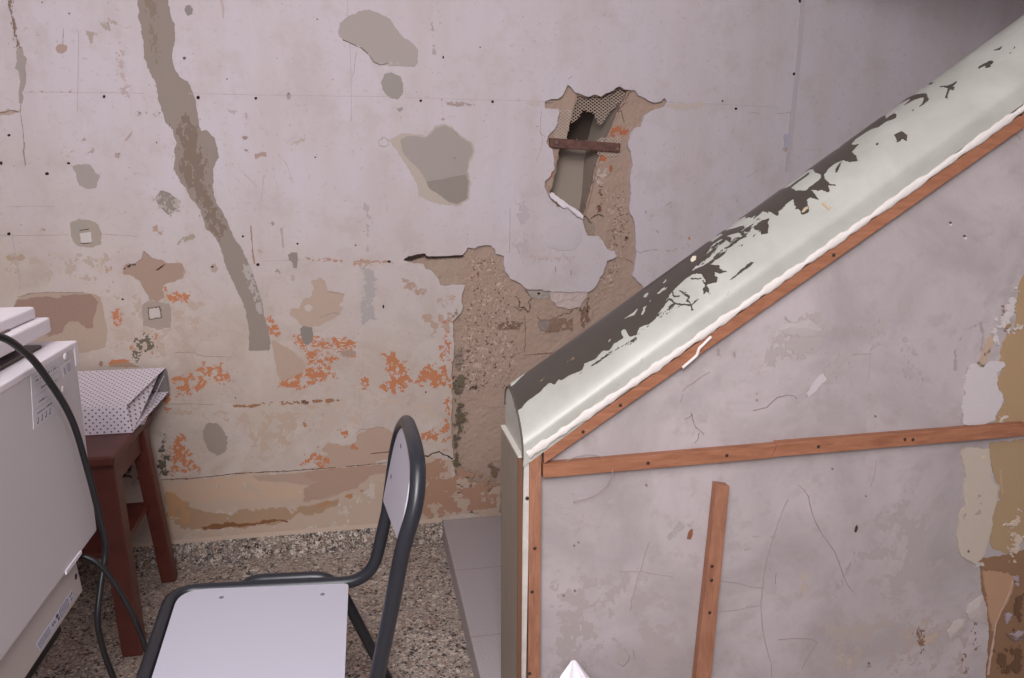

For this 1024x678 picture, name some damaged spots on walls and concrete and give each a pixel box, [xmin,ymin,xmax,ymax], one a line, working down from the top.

peeling [228,110,267,159]
corrosion [549,138,621,152]
spalling [14,294,98,337]
spalling [123,251,191,319]
corrosion [233,398,340,408]
spalling [265,277,357,390]
water stain [156,347,501,540]
spalling [354,81,957,512]
peeling [977,274,1024,423]
peeling [978,439,1024,678]